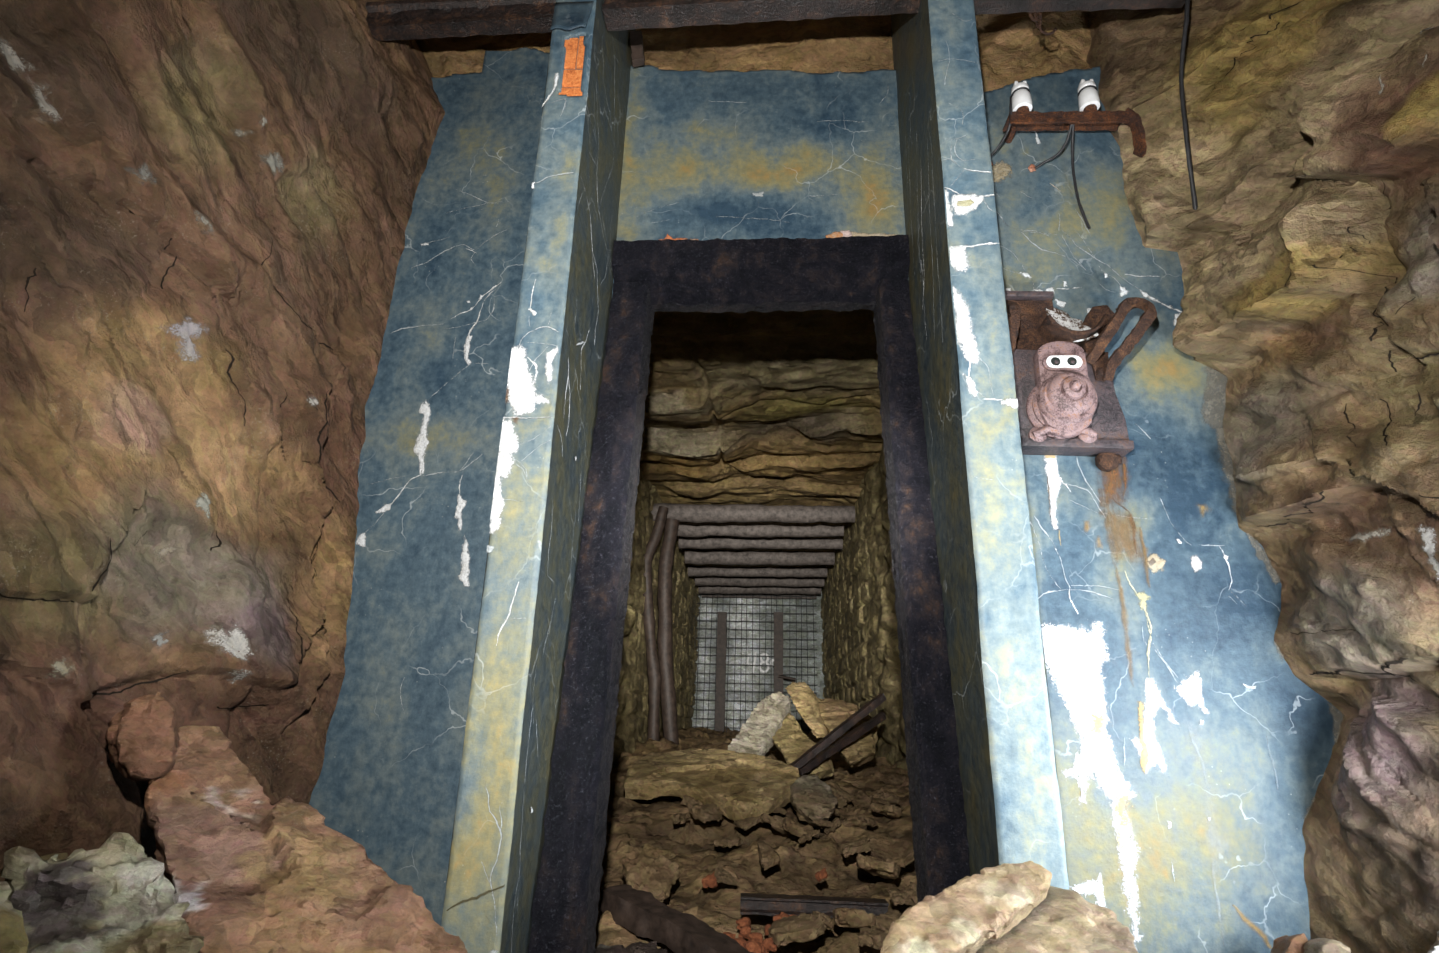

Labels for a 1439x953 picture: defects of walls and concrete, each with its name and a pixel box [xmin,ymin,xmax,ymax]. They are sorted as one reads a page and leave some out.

corrosion [1102,457,1150,586]